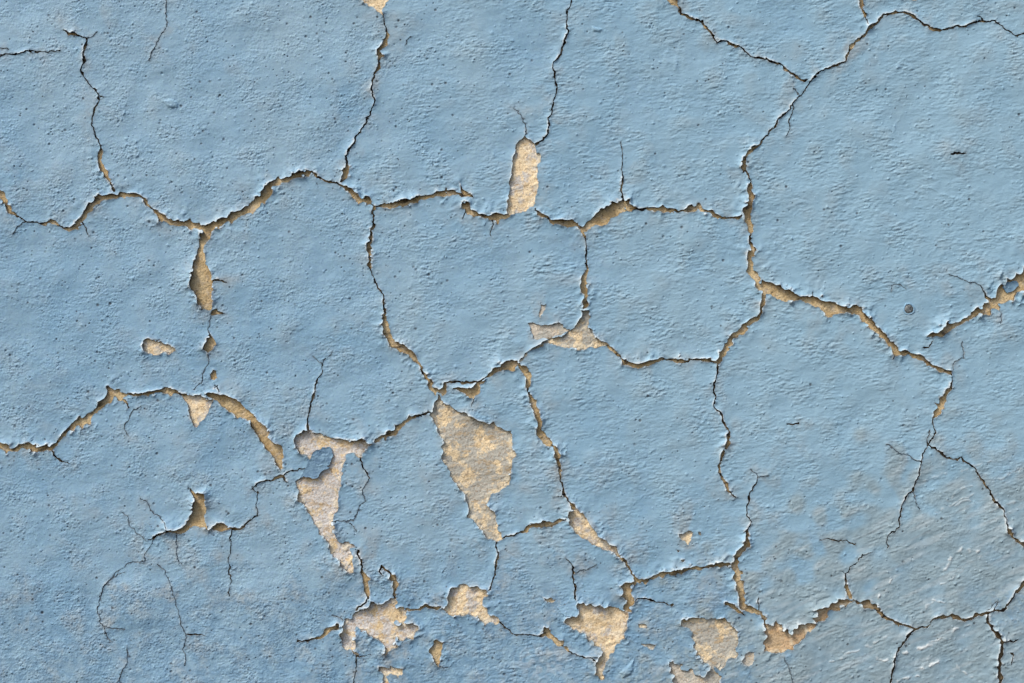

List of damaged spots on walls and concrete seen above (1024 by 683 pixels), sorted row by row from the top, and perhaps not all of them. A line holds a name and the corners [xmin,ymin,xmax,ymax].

peeling [504,110,541,216]
peeling [182,225,375,576]
crack [0,15,578,591]
peeling [430,379,516,542]
peeling [519,231,608,362]
crack [534,0,1024,683]
crack [97,538,205,681]
peeling [122,488,234,596]
crack [297,549,444,642]
crack [499,622,598,663]
peeling [545,595,647,680]
peeling [667,596,855,683]